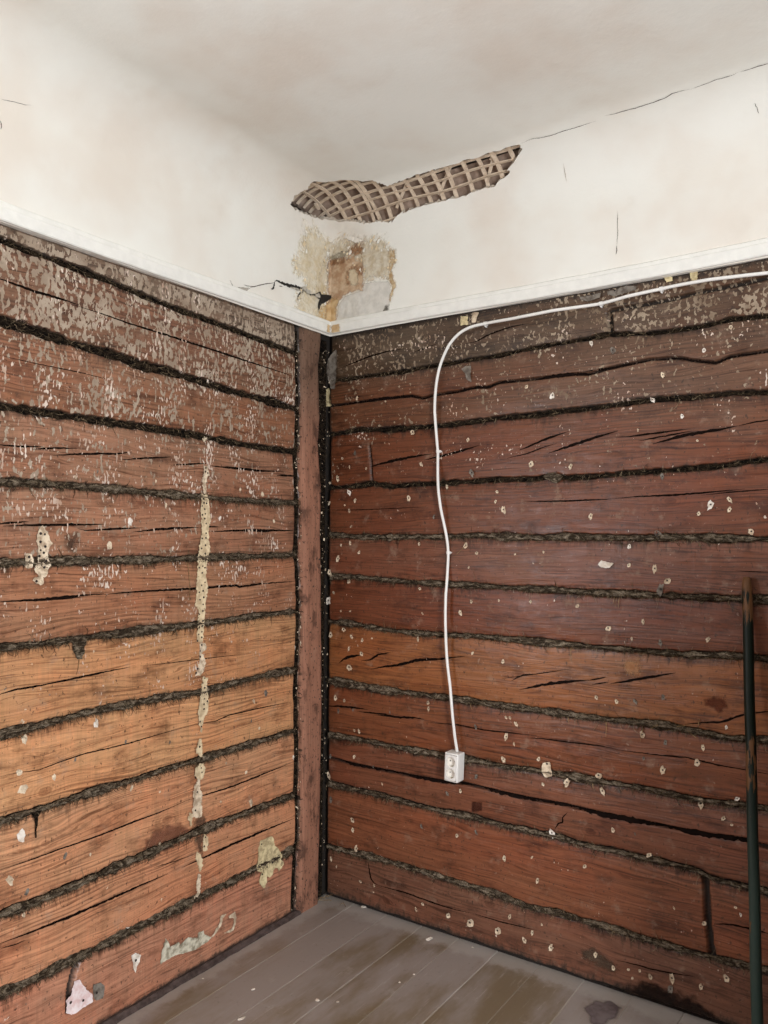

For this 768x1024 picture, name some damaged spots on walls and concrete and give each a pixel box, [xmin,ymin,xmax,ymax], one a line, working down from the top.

spalling [291,145,522,305]
crack [231,251,343,309]
crack [0,279,288,375]
peeling [0,226,296,556]
crack [373,445,479,466]
crack [509,420,768,458]
crack [339,653,464,669]
crack [502,669,673,690]
crack [333,757,767,845]
peeling [160,912,236,964]
damp [585,1001,619,1024]